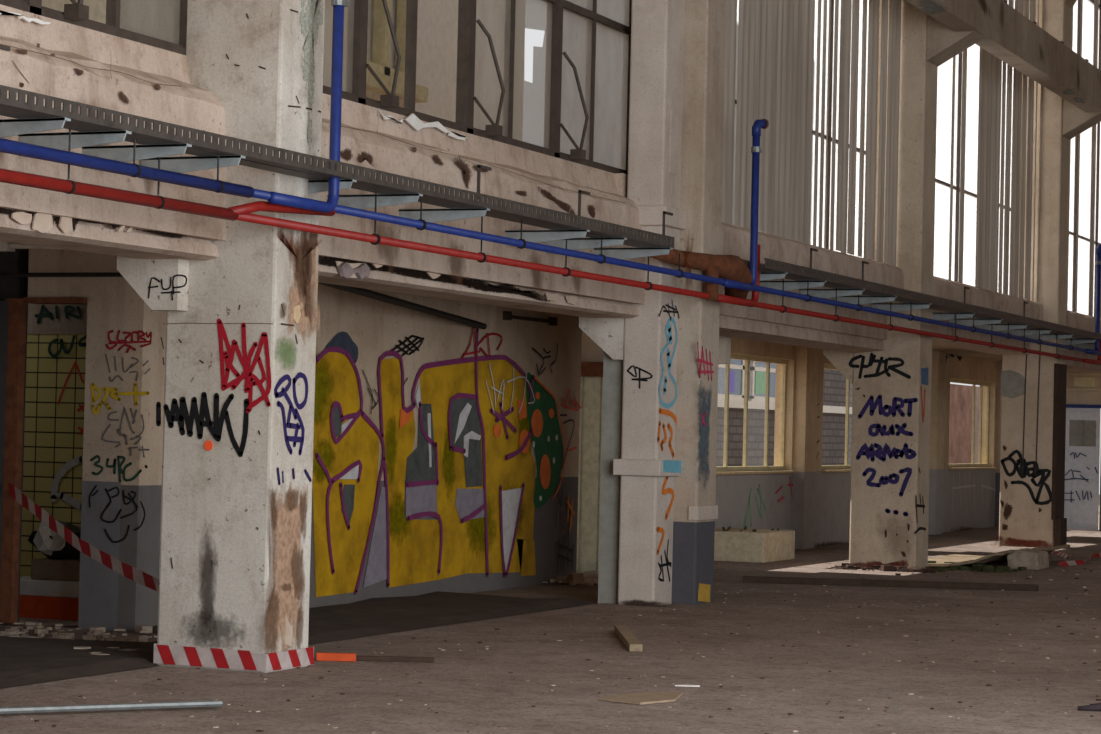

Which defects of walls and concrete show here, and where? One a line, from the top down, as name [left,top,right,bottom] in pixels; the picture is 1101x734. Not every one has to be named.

peeling [378,109,467,140]
spalling [340,149,374,166]
spalling [433,155,488,188]
spalling [516,187,574,214]
spalling [281,233,578,344]
spalling [266,486,308,653]
water stain [191,545,230,645]